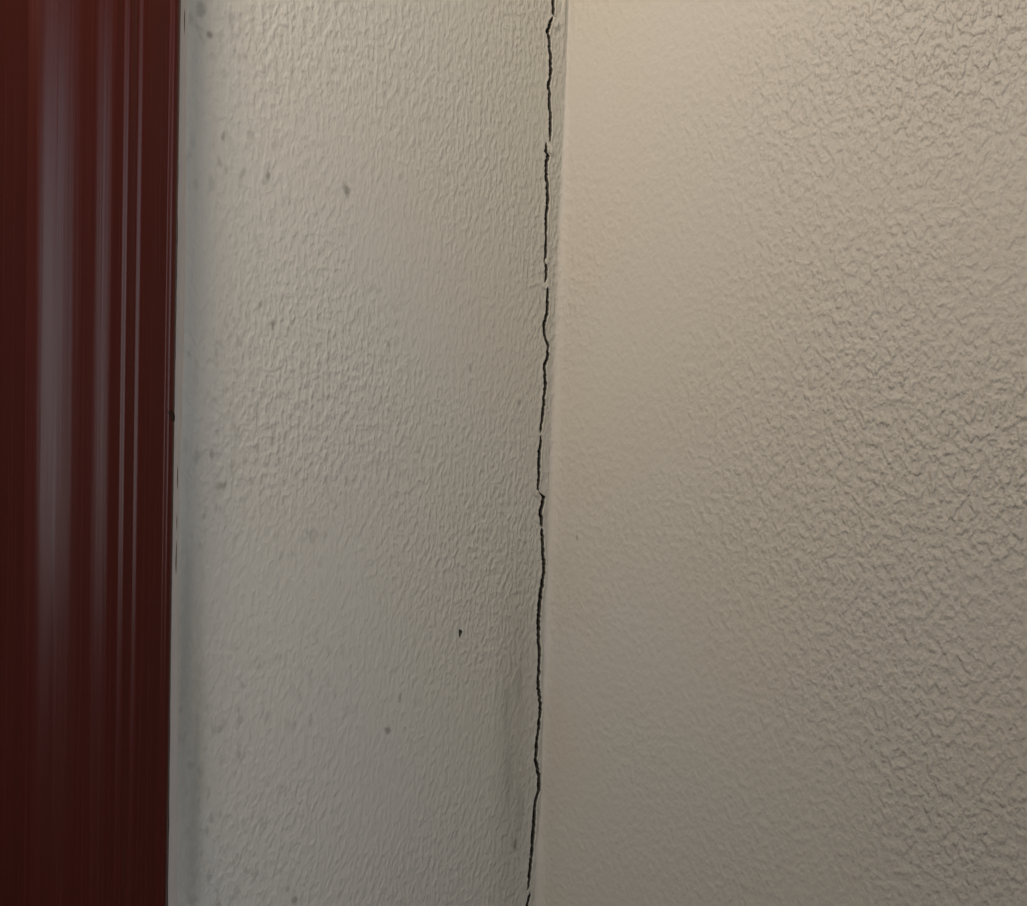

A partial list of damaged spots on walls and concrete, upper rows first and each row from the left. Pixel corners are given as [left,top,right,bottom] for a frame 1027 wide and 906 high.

crack [523,0,558,906]